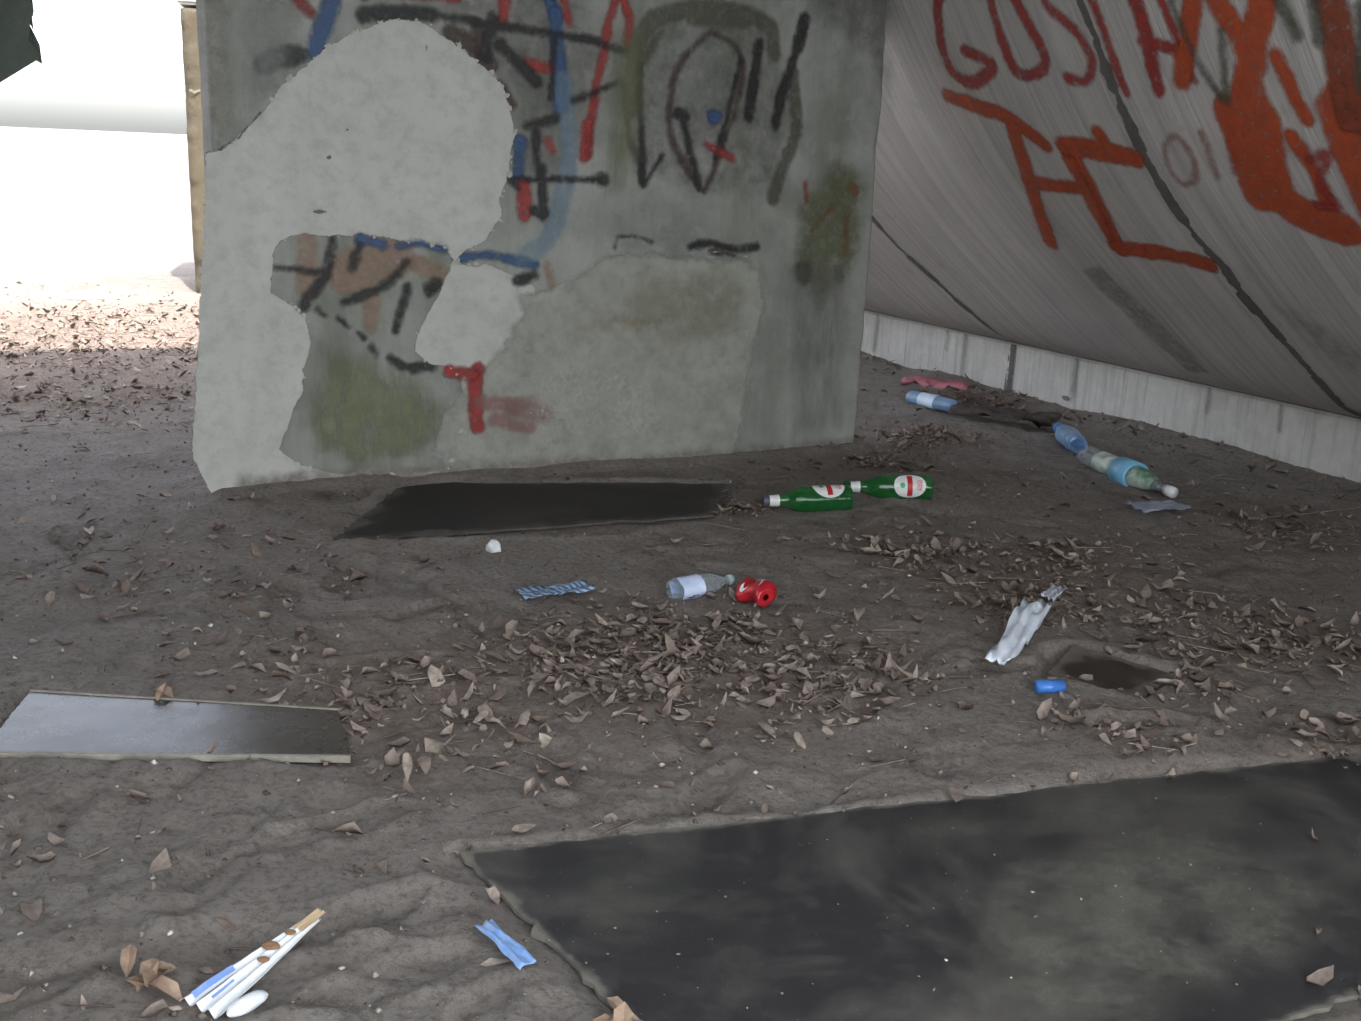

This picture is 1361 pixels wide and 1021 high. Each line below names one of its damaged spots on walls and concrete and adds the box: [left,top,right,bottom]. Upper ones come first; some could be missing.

peeling [192,18,764,493]